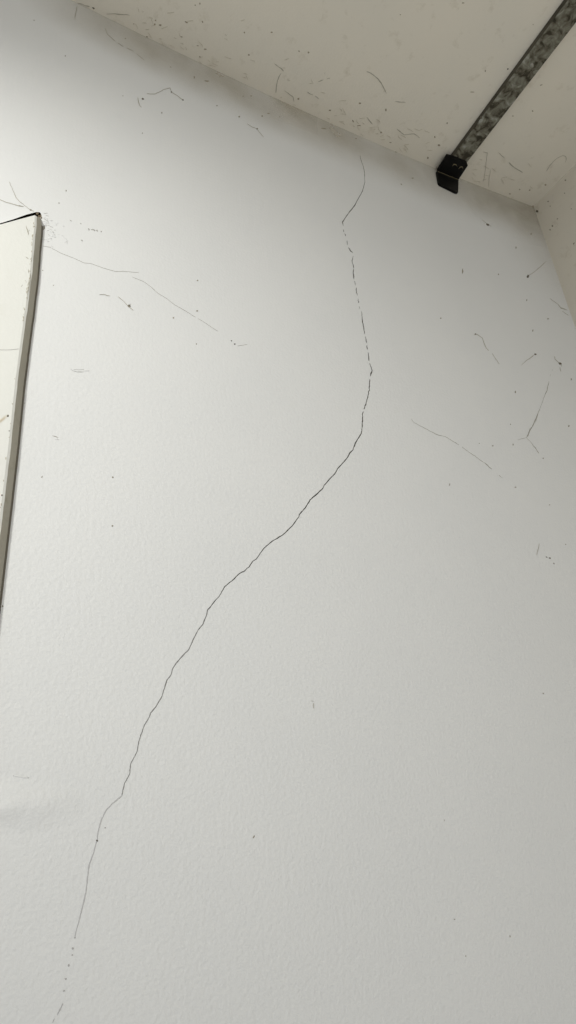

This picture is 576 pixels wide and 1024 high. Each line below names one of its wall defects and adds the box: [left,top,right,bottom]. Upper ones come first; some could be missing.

crack [52,157,374,1023]